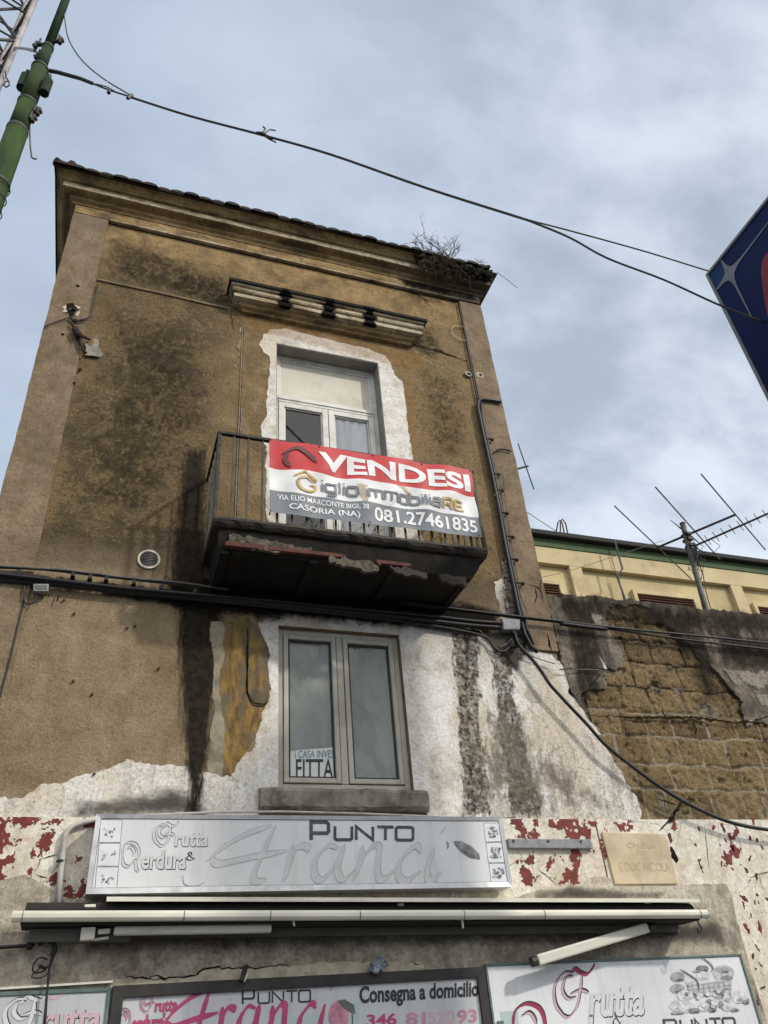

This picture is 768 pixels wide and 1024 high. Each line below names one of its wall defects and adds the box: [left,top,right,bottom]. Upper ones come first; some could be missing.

leakage [118,246,227,302]
leakage [99,328,195,506]
flaking render [259,328,413,523]
spalling [229,533,312,555]
spalling [328,556,468,588]
flaking render [395,527,423,540]
leakage [31,450,608,817]
flaking render [0,561,768,970]
crack [116,964,302,982]